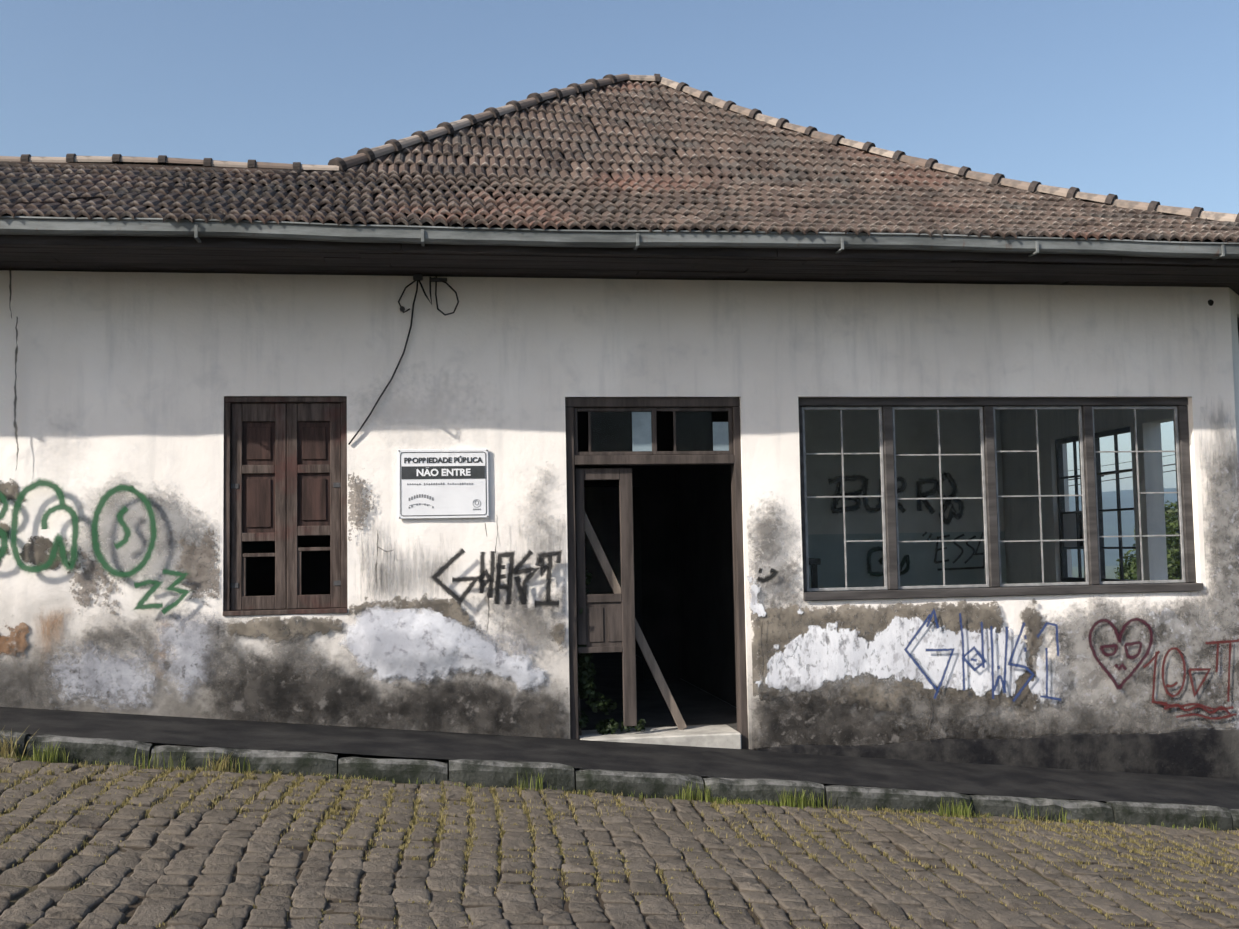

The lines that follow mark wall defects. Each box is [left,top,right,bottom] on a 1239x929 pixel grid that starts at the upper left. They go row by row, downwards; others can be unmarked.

crack [9,267,19,469]
flaking render [0,481,25,503]
flaking render [0,622,36,657]
flaking render [0,523,123,614]
flaking render [169,526,220,606]
leakage [0,610,567,739]
leakage [485,589,566,650]
peeling [747,576,1070,724]
leakage [748,416,1239,750]